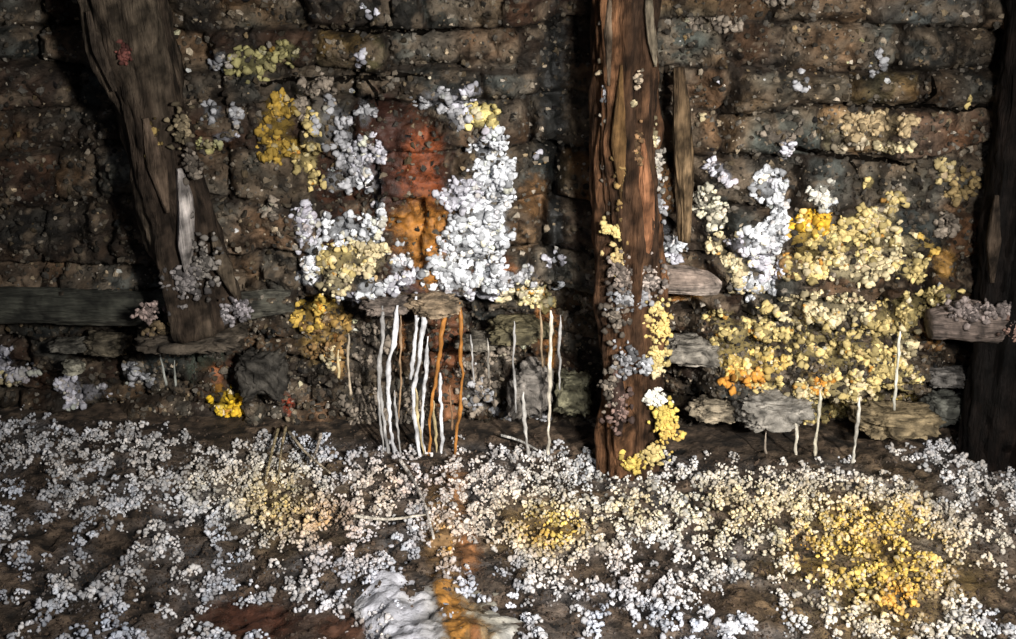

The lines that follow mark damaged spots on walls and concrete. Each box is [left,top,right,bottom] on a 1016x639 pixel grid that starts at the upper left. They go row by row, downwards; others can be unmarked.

rust [370,98,447,293]